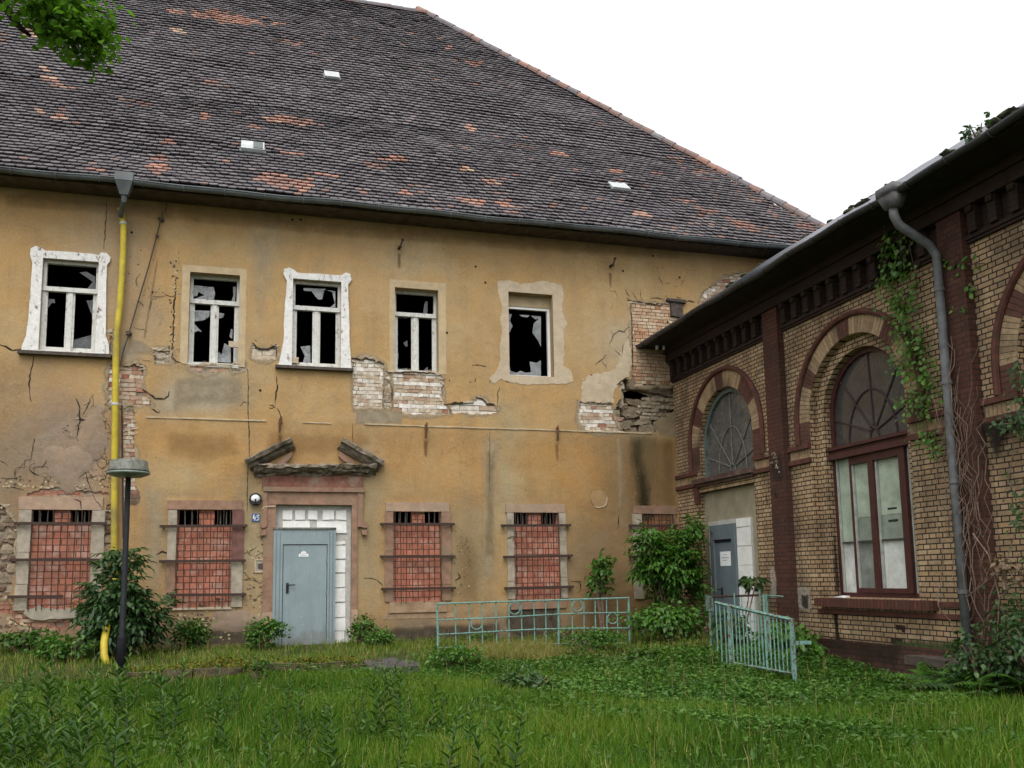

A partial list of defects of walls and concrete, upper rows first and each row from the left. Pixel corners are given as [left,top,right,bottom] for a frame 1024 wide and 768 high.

crack [1,345,34,401]
crack [1,397,111,508]
flaking render [0,251,179,552]
crack [122,274,183,413]
flaking render [186,341,299,378]
crack [241,339,281,505]
flaking render [351,354,500,419]
flaking render [575,300,684,436]
crack [587,277,694,410]
water stain [633,439,651,518]
flaking render [0,502,82,643]